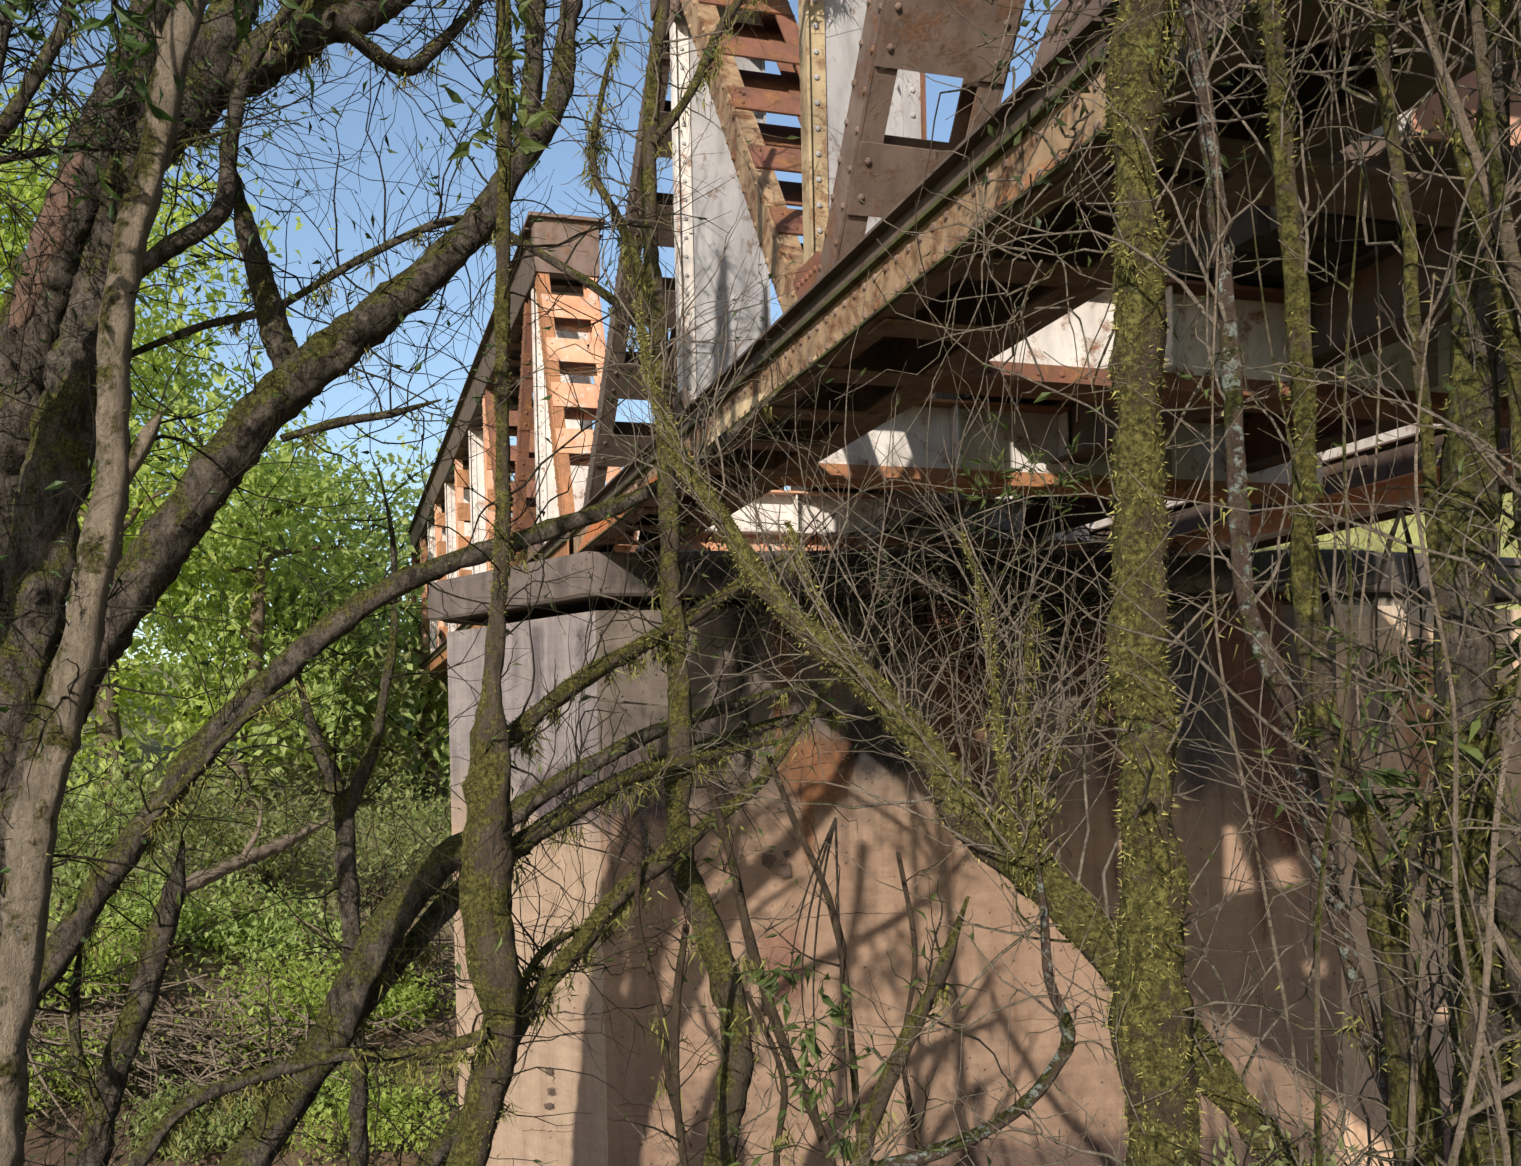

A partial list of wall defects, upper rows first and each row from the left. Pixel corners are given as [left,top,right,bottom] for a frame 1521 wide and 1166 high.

rust [997,160,1054,205]
rust [1206,592,1304,858]